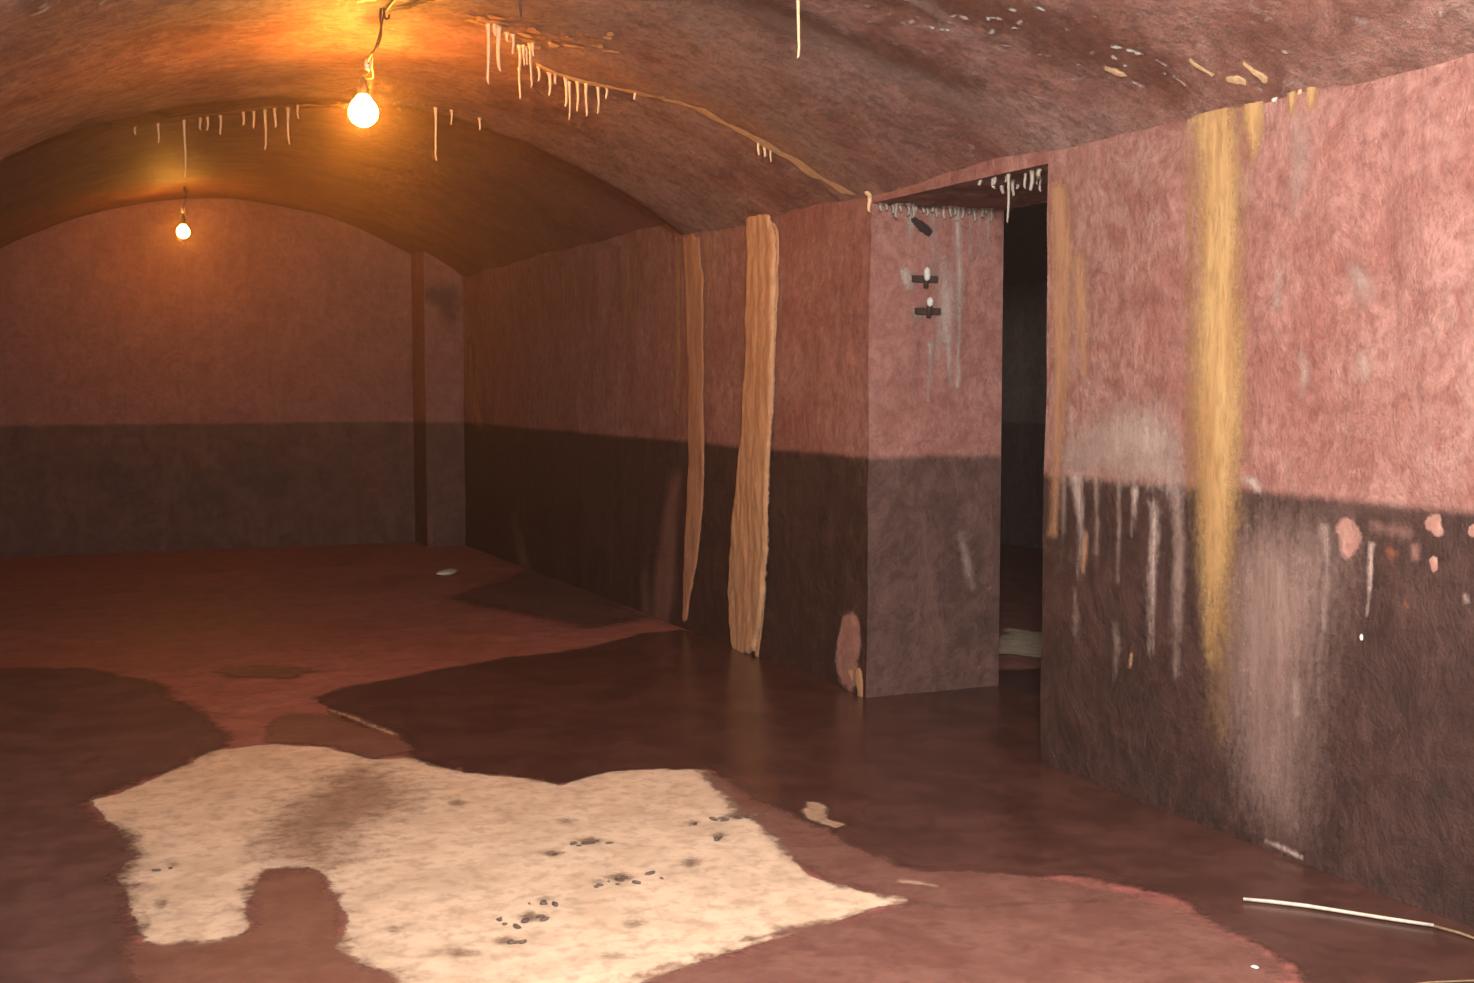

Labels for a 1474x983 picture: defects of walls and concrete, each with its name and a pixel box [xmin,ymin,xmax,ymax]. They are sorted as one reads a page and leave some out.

efflorescence [102,103,334,178]
efflorescence [462,14,1043,388]
damp [263,87,1474,983]
peeling [1336,517,1393,591]
peeling [1429,556,1438,572]
peeling [1425,514,1443,537]